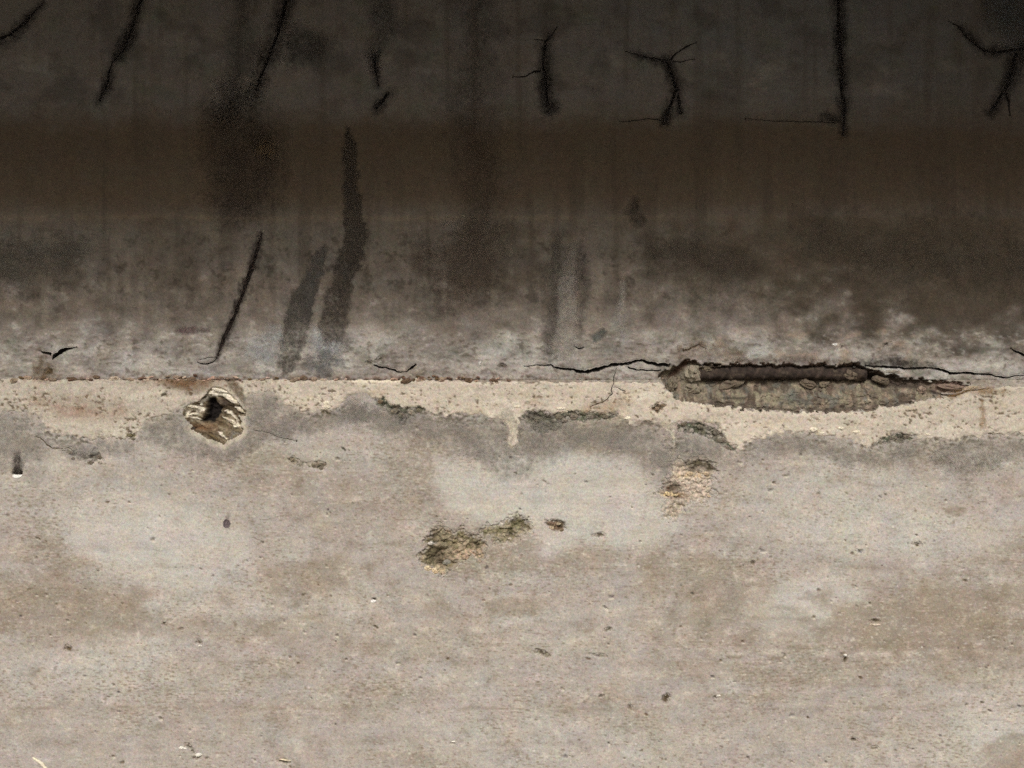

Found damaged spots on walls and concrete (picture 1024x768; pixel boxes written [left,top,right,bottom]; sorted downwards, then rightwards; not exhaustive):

crack [98,0,144,101]
crack [513,26,559,114]
crack [620,41,697,125]
crack [746,0,849,136]
damp [248,127,367,376]
crack [197,233,263,366]
crack [40,346,76,360]
flaking render [0,359,1024,465]
crack [524,343,706,408]
crack [866,348,1024,398]
spalling [653,451,719,523]
spalling [416,511,567,579]